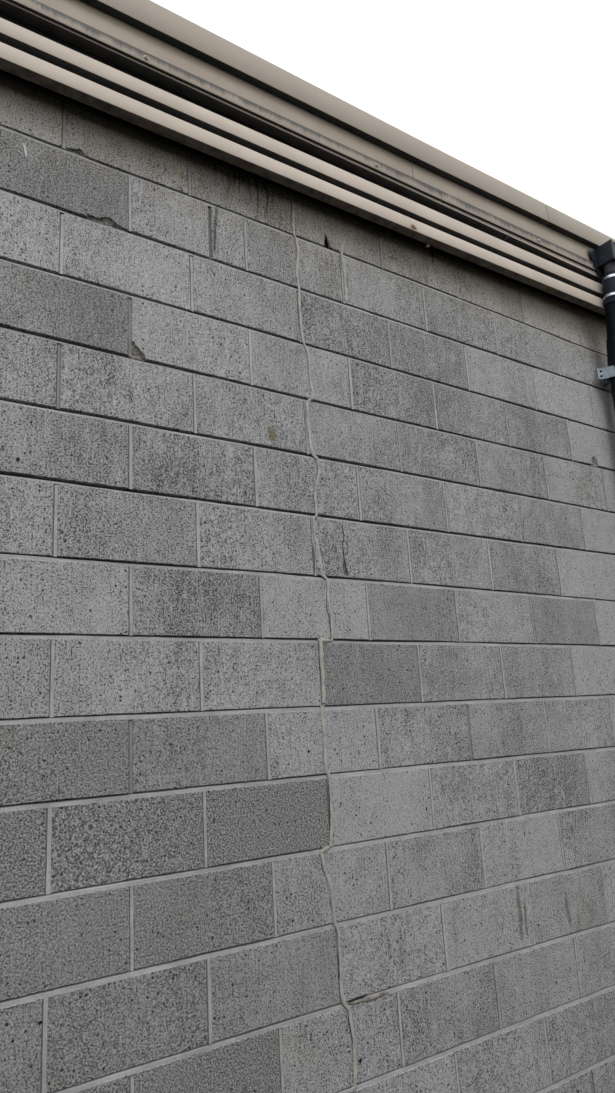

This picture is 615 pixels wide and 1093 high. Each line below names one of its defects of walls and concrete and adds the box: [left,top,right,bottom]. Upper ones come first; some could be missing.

crack [291,196,358,1093]